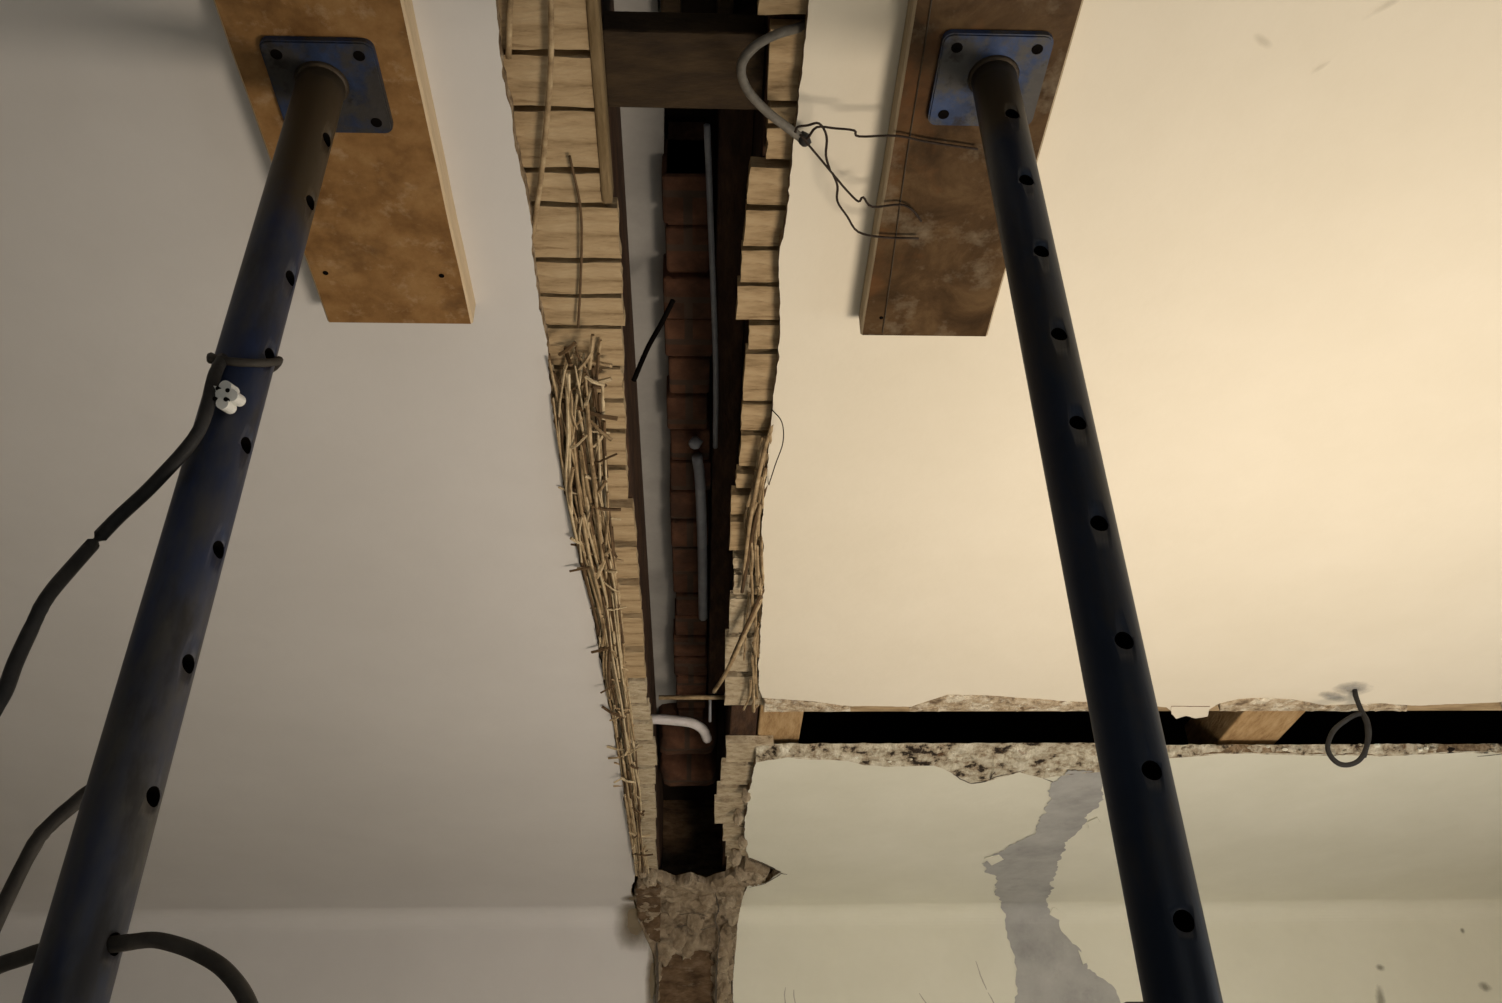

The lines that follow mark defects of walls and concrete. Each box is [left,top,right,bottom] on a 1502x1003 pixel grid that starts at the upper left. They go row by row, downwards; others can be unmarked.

flaking render [763,698,850,712]
flaking render [909,695,1089,712]
flaking render [1171,698,1408,719]
flaking render [1166,743,1502,758]
peeling [756,742,1120,1003]
spalling [634,787,770,1003]